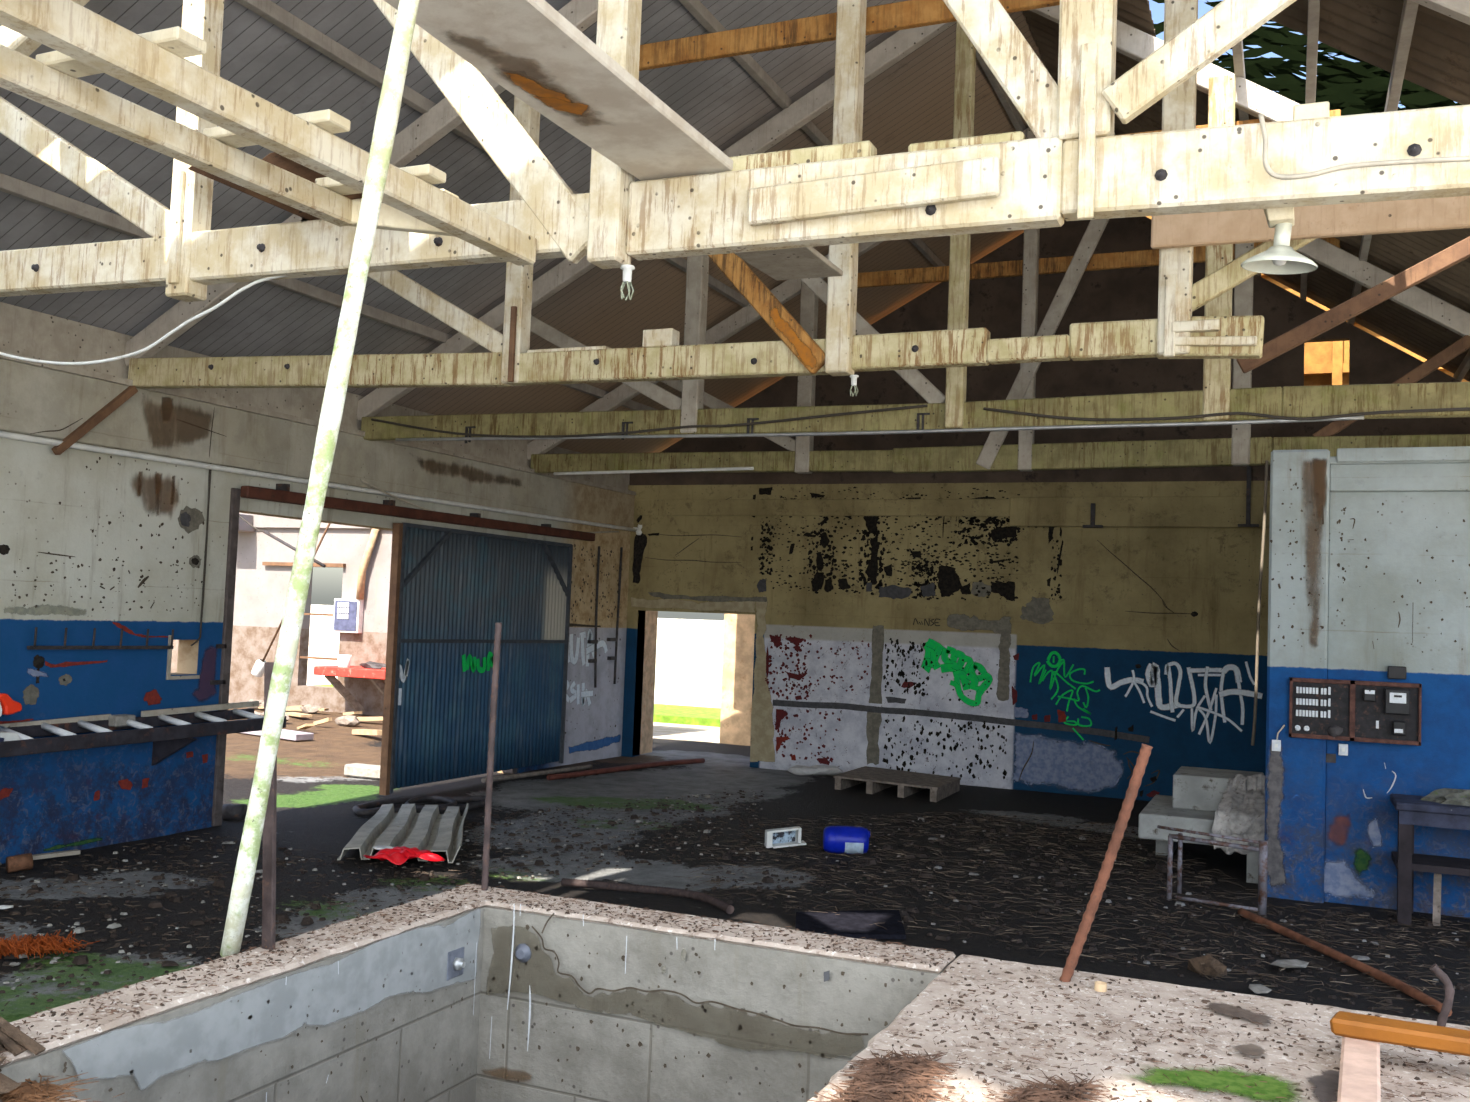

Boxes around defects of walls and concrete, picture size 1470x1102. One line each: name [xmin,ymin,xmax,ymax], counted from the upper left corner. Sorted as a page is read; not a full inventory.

peeling [751,487,1063,601]
corrosion [1303,459,1326,646]
peeling [765,634,1160,982]
damp [486,913,868,1059]